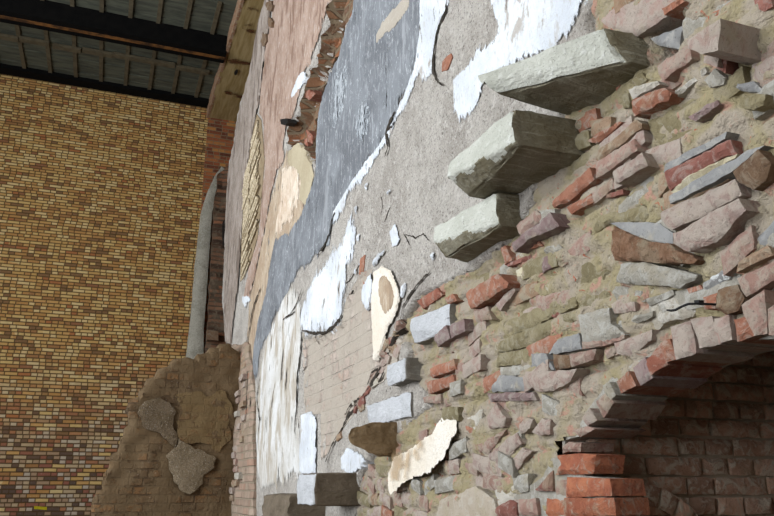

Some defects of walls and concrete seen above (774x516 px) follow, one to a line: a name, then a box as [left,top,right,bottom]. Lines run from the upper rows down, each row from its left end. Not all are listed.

peeling [291,71,309,98]
spalling [302,0,774,516]
spalling [175,390,233,452]
crack [325,271,430,463]